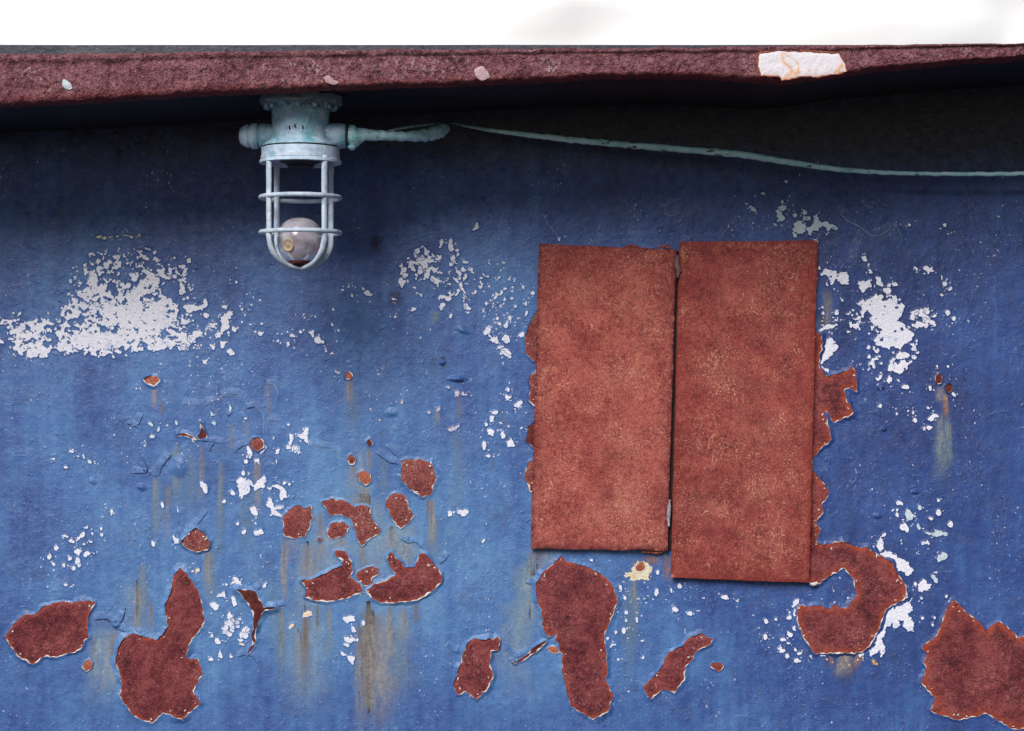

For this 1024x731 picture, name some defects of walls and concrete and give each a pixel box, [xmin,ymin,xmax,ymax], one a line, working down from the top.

peeling [756,49,848,81]
peeling [0,228,340,365]
peeling [341,282,374,303]
peeling [390,236,537,494]
peeling [2,507,115,673]
peeling [109,422,445,727]
peeling [446,508,470,518]
peeling [451,550,705,724]
peeling [638,628,725,703]
peeling [752,253,1024,731]